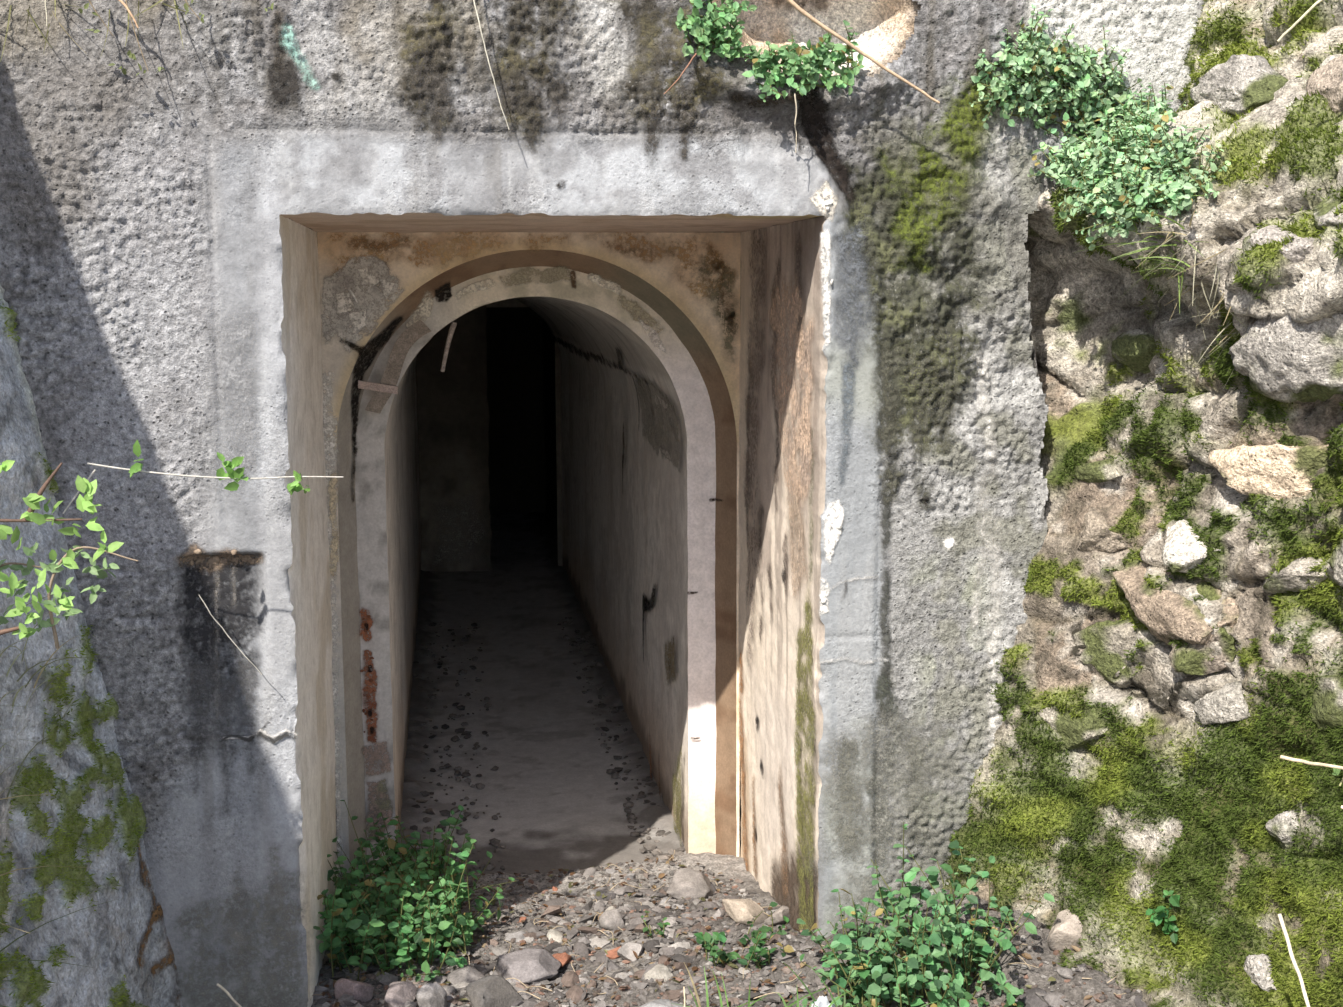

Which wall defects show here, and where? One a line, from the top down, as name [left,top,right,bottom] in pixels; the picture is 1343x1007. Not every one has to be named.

damp [397,0,458,138]
damp [491,0,576,148]
damp [619,0,729,159]
peeling [321,255,404,352]
damp [835,82,1001,549]
damp [183,560,259,780]
crack [221,722,295,744]
damp [972,501,1003,750]